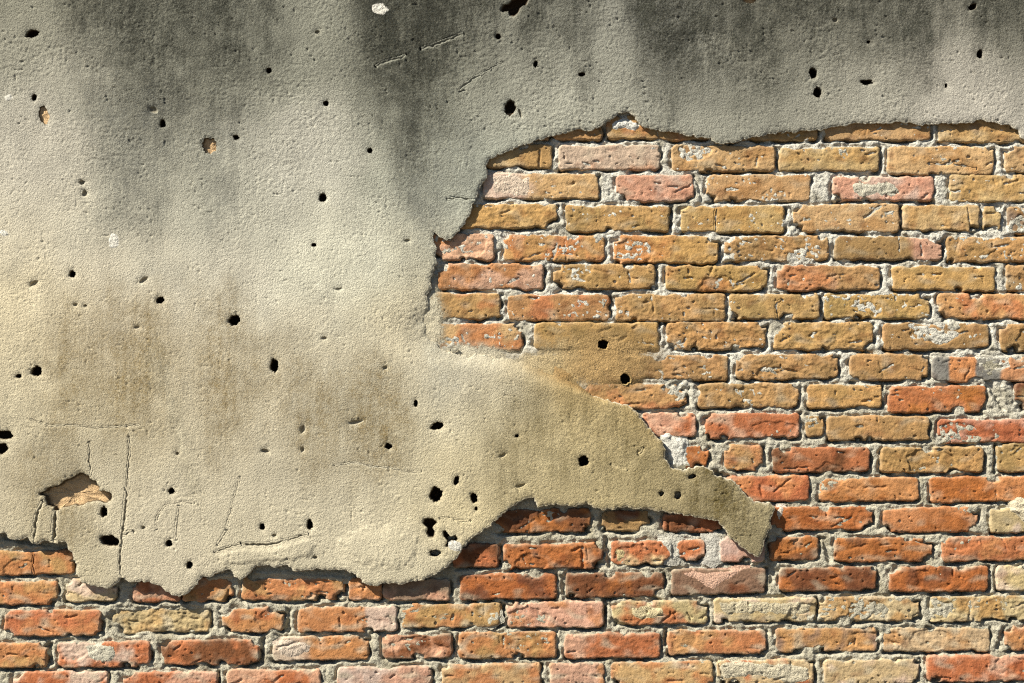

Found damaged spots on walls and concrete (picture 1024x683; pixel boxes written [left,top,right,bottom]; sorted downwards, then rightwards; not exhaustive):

leakage [966,0,1002,32]
leakage [94,0,247,113]
leakage [357,0,498,106]
leakage [627,0,934,85]
spalling [726,172,762,192]
peeling [109,233,119,248]
spalling [550,300,589,326]
spalling [712,276,754,323]
spalling [38,472,113,511]
crack [27,417,140,578]
spalling [422,517,437,540]